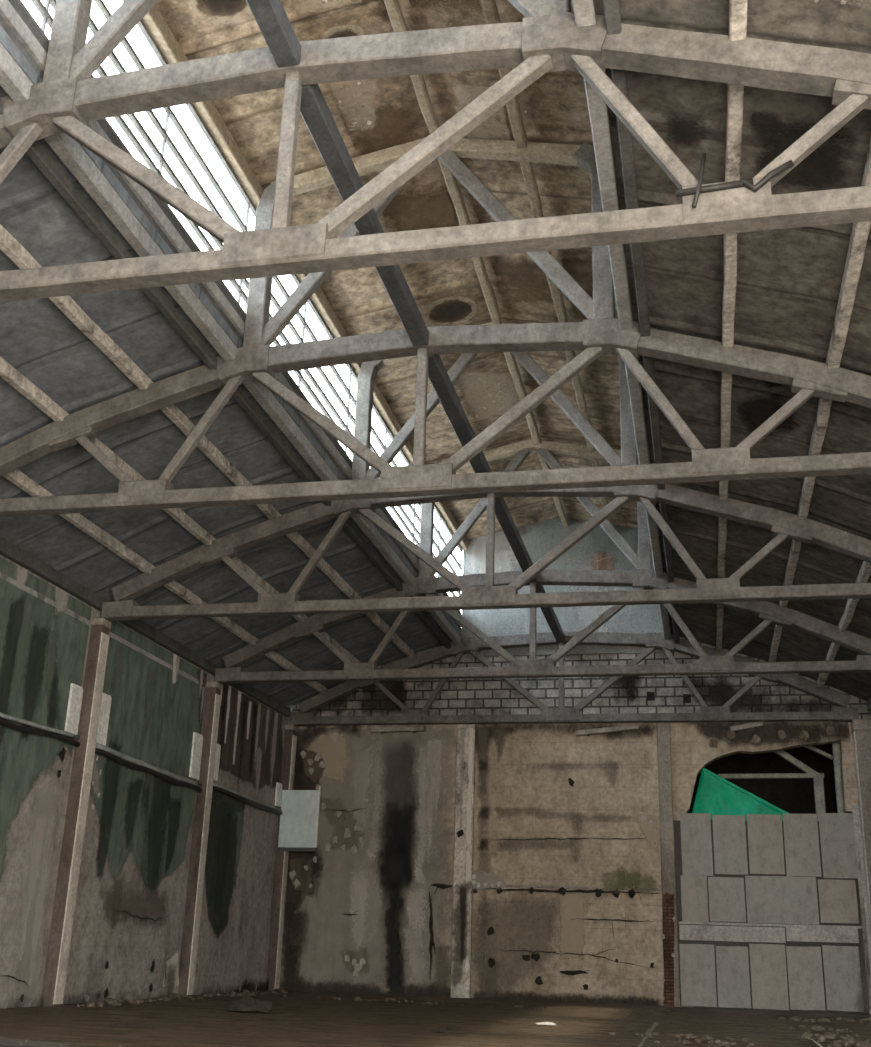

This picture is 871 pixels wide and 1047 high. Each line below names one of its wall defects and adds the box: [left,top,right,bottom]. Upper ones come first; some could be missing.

peeling [289,732,363,894]
leakage [246,724,659,1006]
spalling [235,980,269,992]